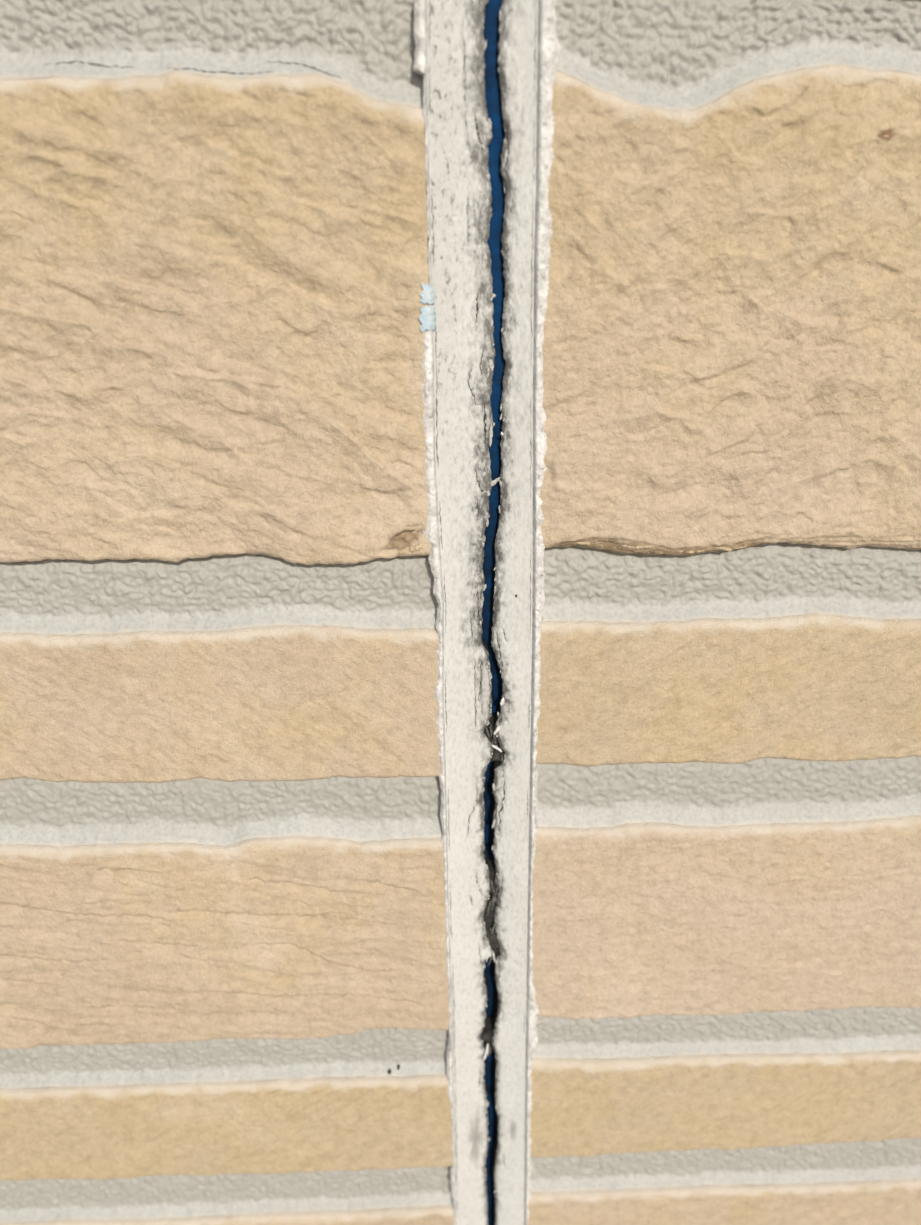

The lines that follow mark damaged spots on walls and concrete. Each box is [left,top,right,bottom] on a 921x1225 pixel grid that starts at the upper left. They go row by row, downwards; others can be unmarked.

crack [428,194,436,266]
crack [432,308,440,461]
crack [444,0,535,1225]